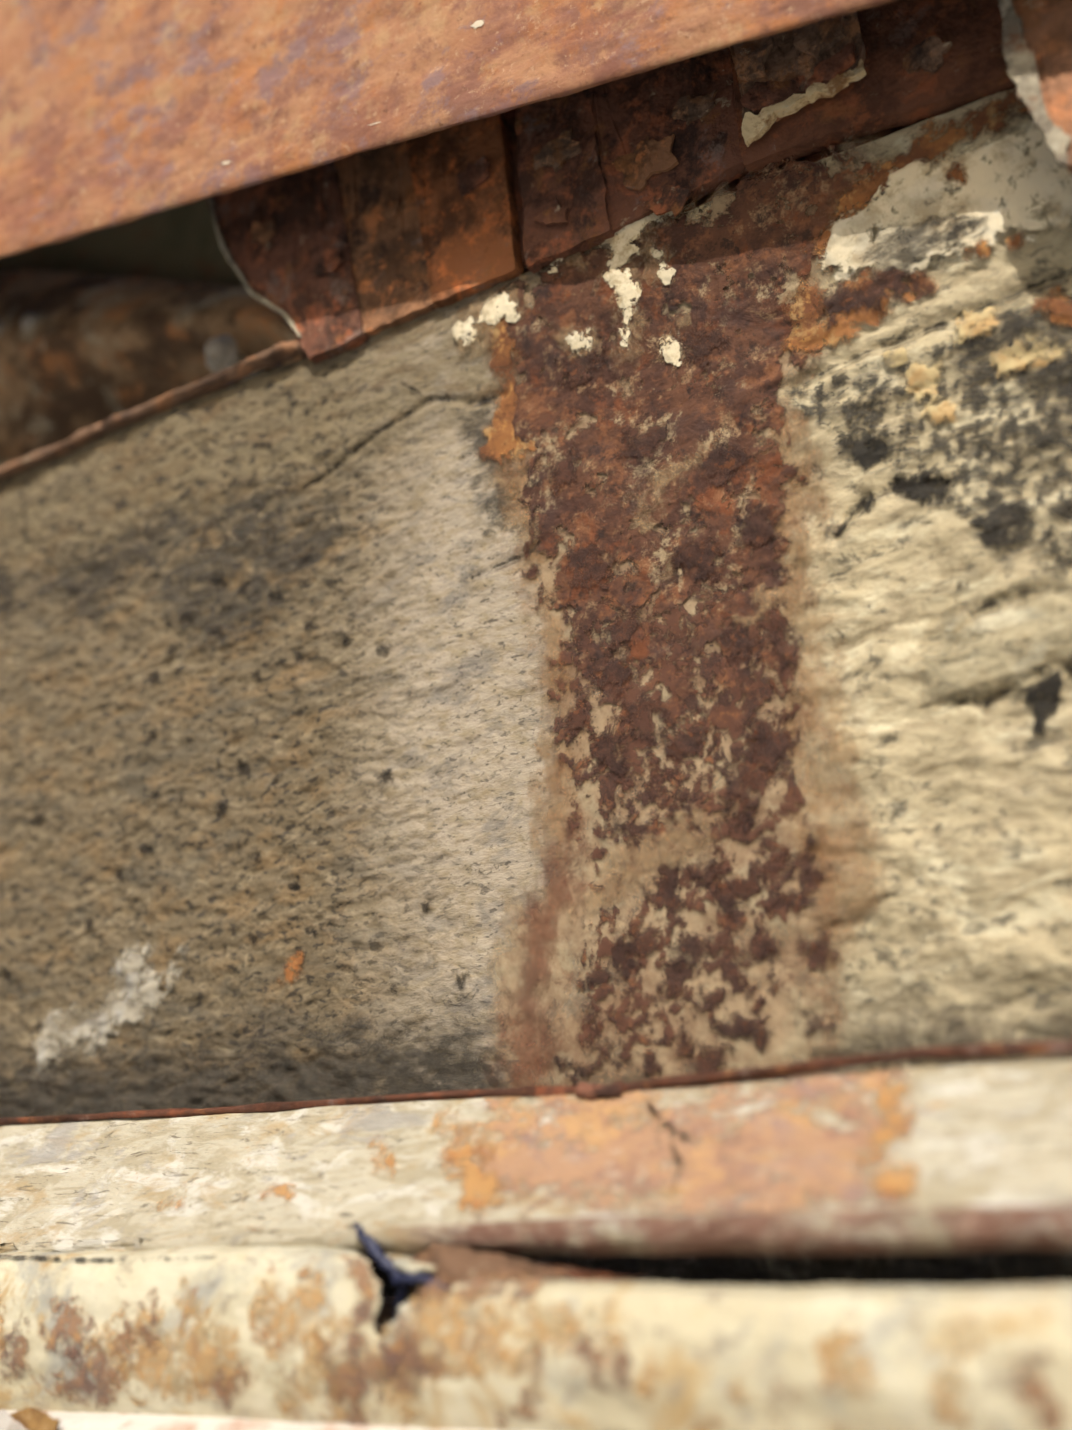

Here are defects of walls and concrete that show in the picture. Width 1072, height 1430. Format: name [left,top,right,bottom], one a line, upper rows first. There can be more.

rust [729,11,866,147]
rust [902,36,952,74]
peeling [820,121,1072,280]
peeling [950,286,1072,377]
crack [304,383,506,489]
spalling [837,426,911,471]
spalling [858,470,953,513]
peeling [881,347,958,425]
leakage [788,277,1072,579]
rust [433,85,1030,1220]